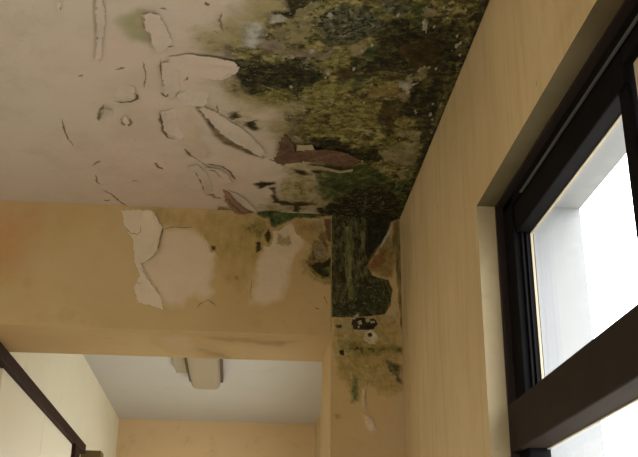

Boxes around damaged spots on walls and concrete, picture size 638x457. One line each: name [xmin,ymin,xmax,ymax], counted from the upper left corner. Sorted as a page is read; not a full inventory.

flaking render [103,0,172,54]
crack [159,77,236,199]
peeling [189,105,362,173]
peeling [211,189,258,214]
water stain [134,0,489,408]
flaking render [121,210,224,316]
flaking render [242,223,305,314]
flaking render [364,230,396,284]
flaking render [331,301,398,344]